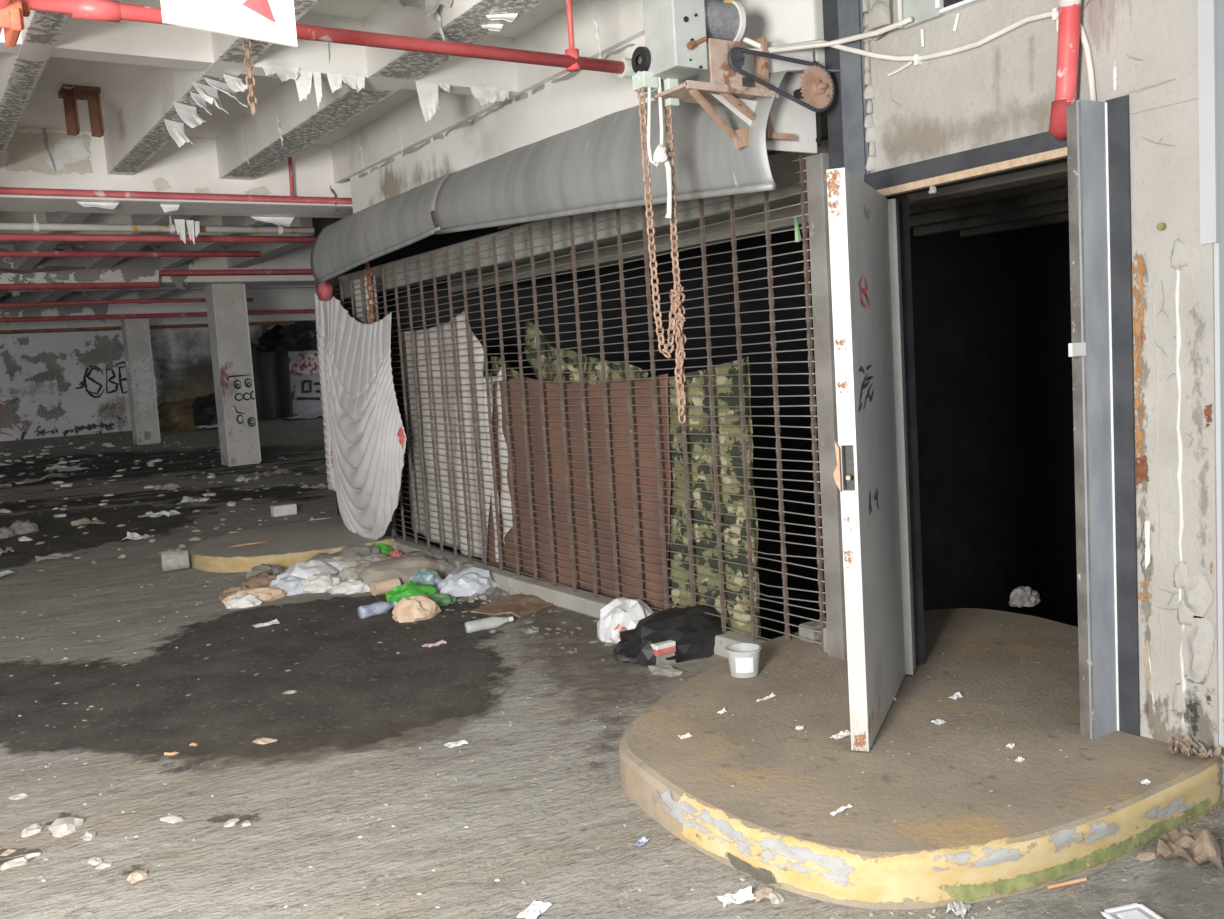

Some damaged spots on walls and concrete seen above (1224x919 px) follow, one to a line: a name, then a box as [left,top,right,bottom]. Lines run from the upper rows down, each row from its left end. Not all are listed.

peeling [124,74,248,170]
peeling [231,41,375,195]
peeling [153,178,200,245]
peeling [251,217,295,226]
rust [825,170,840,217]
peeling [0,245,195,431]
rust [1132,252,1149,485]
peeling [654,789,856,887]
peeling [932,847,1022,871]
peeling [1048,820,1120,853]
peeling [1145,796,1194,828]